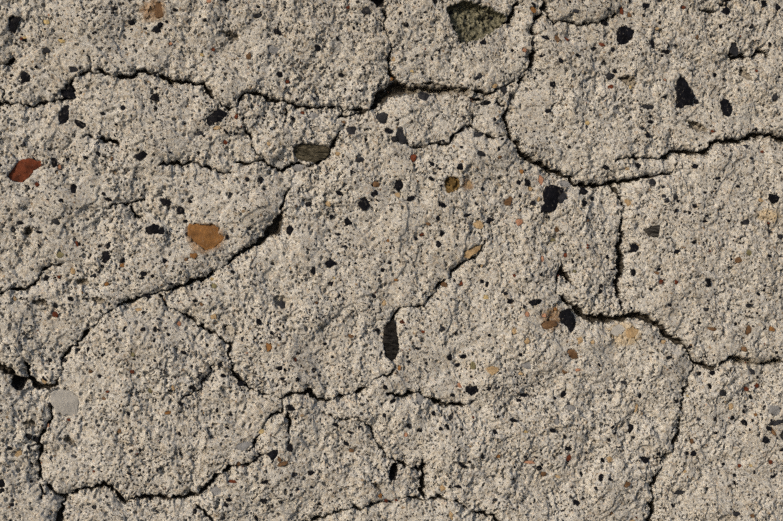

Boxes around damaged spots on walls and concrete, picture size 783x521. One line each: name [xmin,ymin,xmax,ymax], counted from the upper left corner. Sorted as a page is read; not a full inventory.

crack [0,57,15,66]
crack [0,88,68,108]
crack [69,0,783,373]
crack [0,188,500,521]
crack [645,379,688,521]